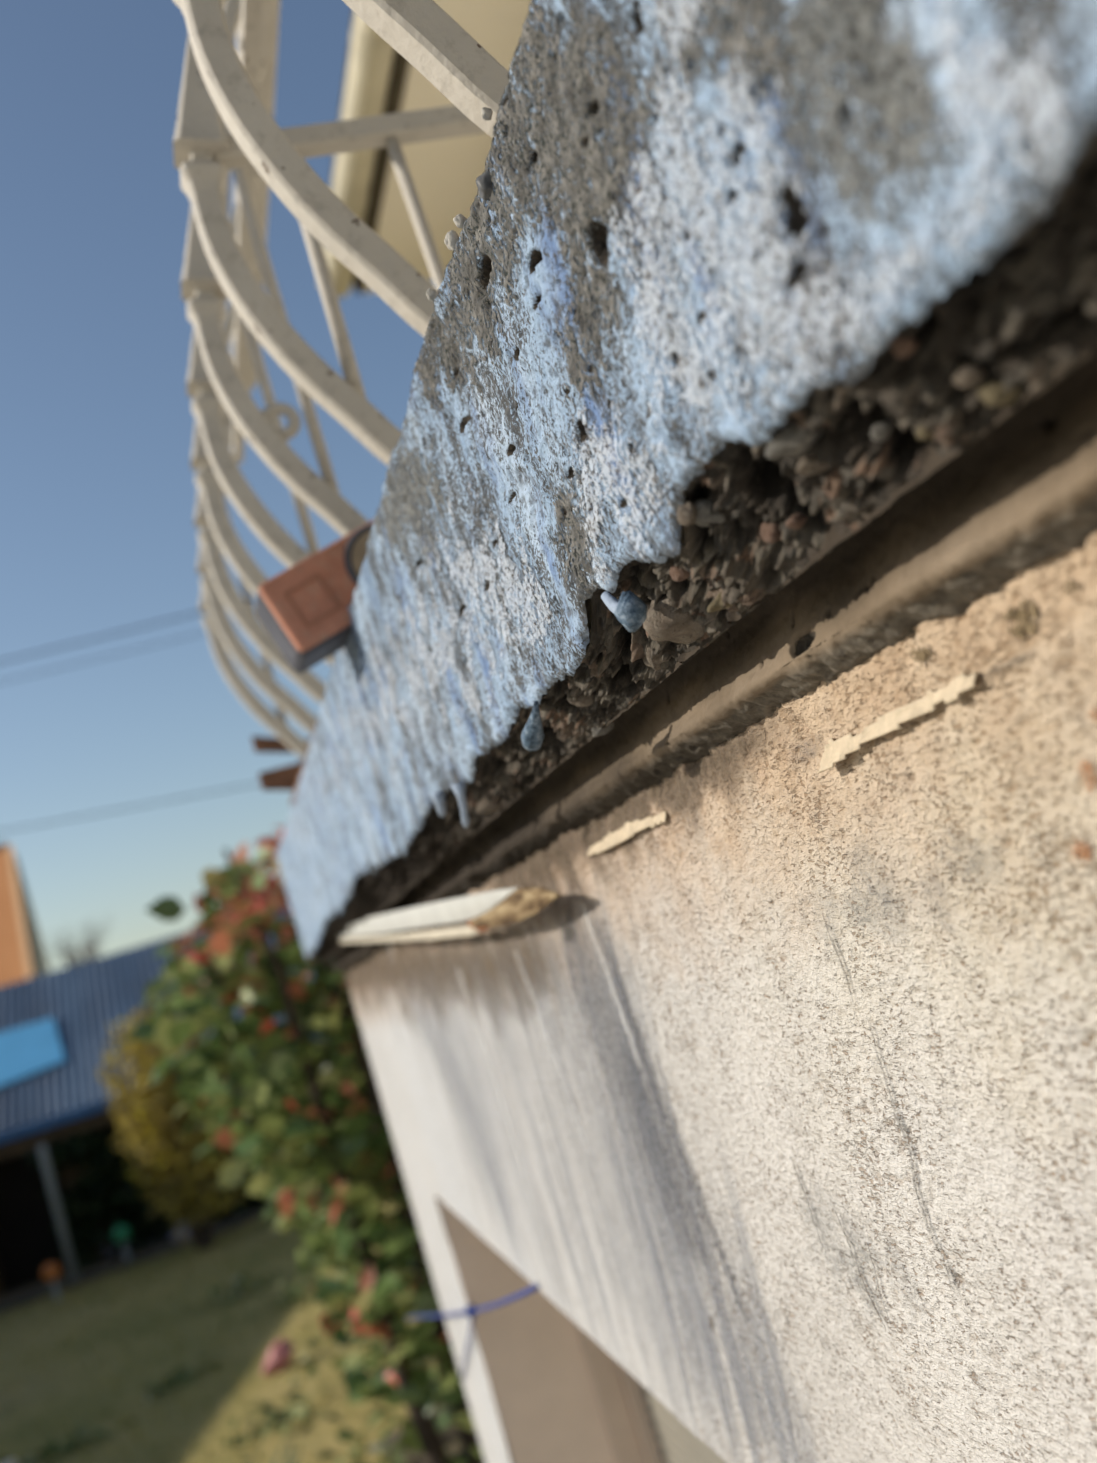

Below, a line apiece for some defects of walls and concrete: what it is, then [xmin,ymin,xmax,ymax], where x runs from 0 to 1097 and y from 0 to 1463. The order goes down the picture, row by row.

peeling [410,0,693,418]
spalling [310,128,1097,962]
leakage [494,730,755,898]
leakage [344,927,547,1009]
crack [871,1029,951,1274]